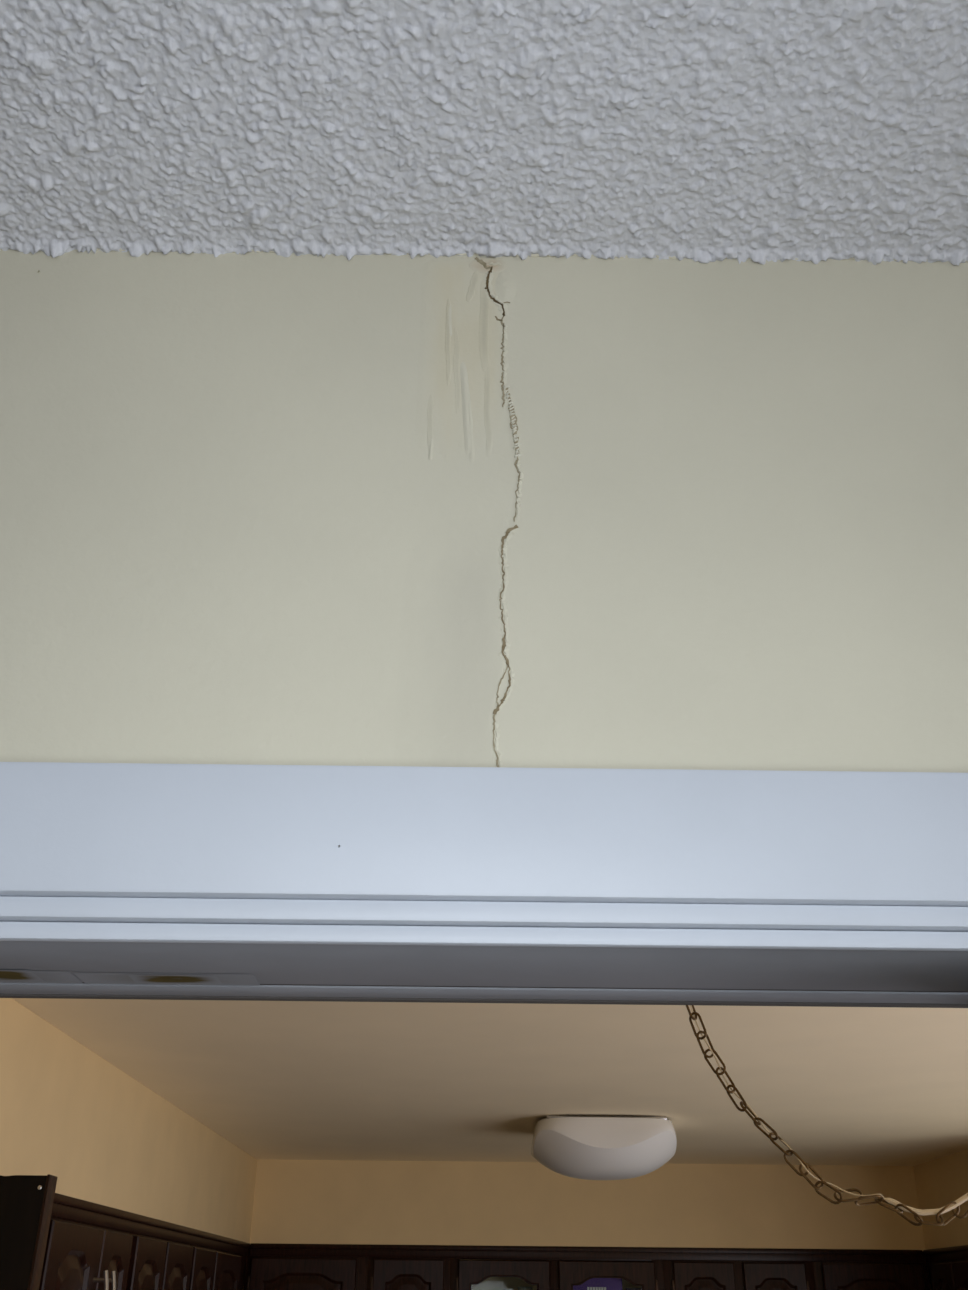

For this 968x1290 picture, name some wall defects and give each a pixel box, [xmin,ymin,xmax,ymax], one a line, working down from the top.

crack [475,257,524,767]